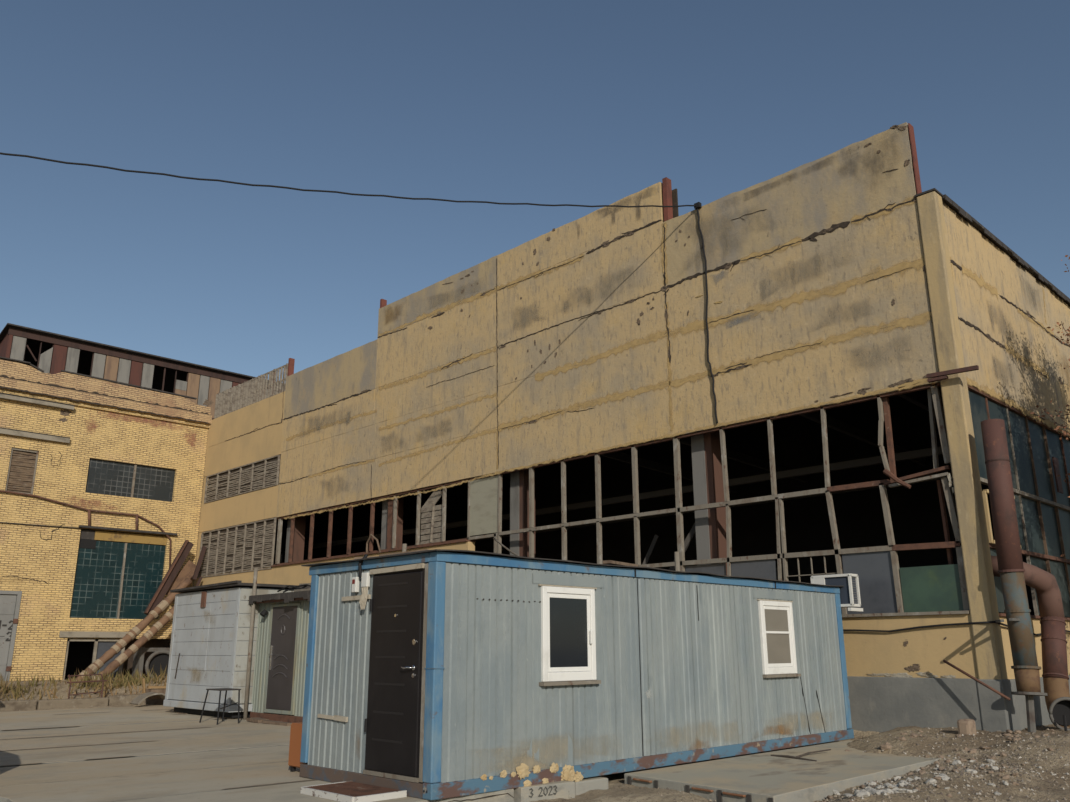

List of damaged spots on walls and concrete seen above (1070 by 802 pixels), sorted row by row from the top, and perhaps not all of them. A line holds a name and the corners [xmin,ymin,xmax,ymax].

crack [428,196,917,465]
crack [867,260,962,282]